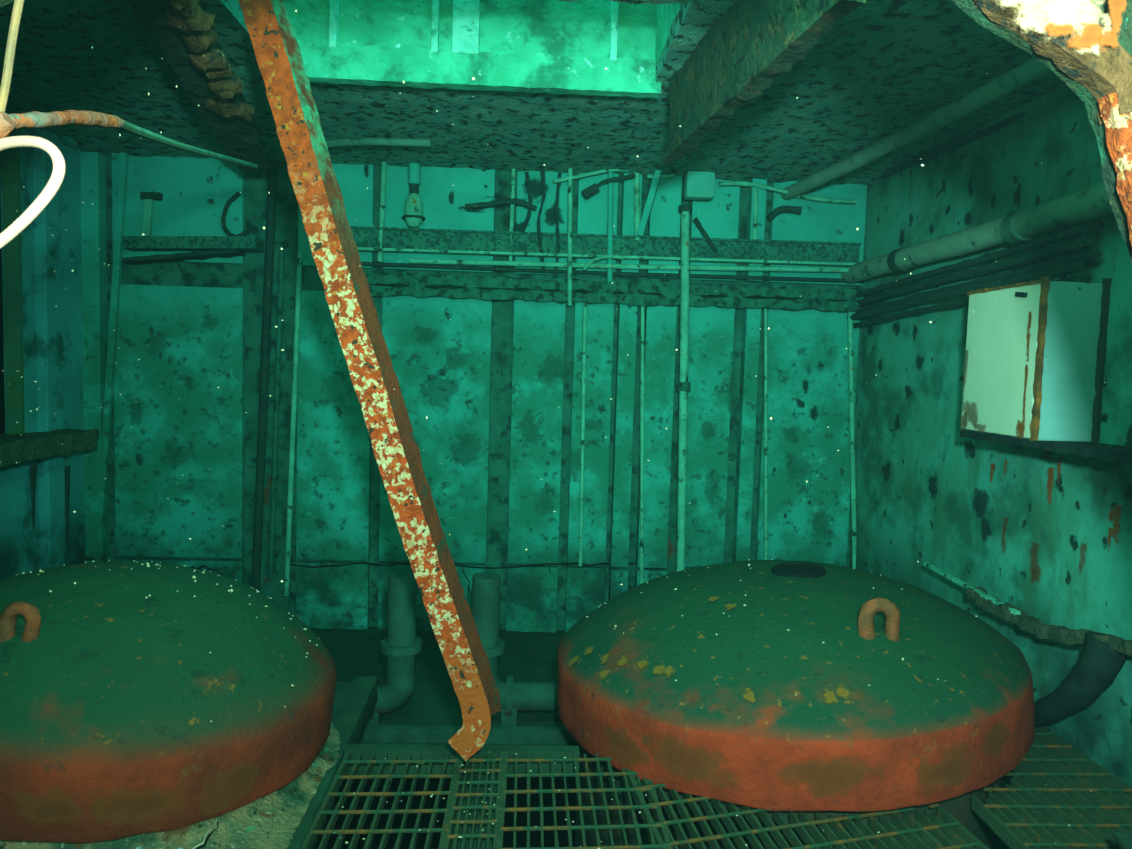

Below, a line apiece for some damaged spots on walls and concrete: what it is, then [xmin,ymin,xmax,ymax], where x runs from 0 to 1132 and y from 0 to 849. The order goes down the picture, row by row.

peeling [1001,0,1112,55]
damp [928,474,937,498]
rust [1044,451,1061,504]
damp [972,487,991,541]
rust [1102,487,1132,546]
rust [1031,543,1041,581]
rust [1065,543,1087,584]